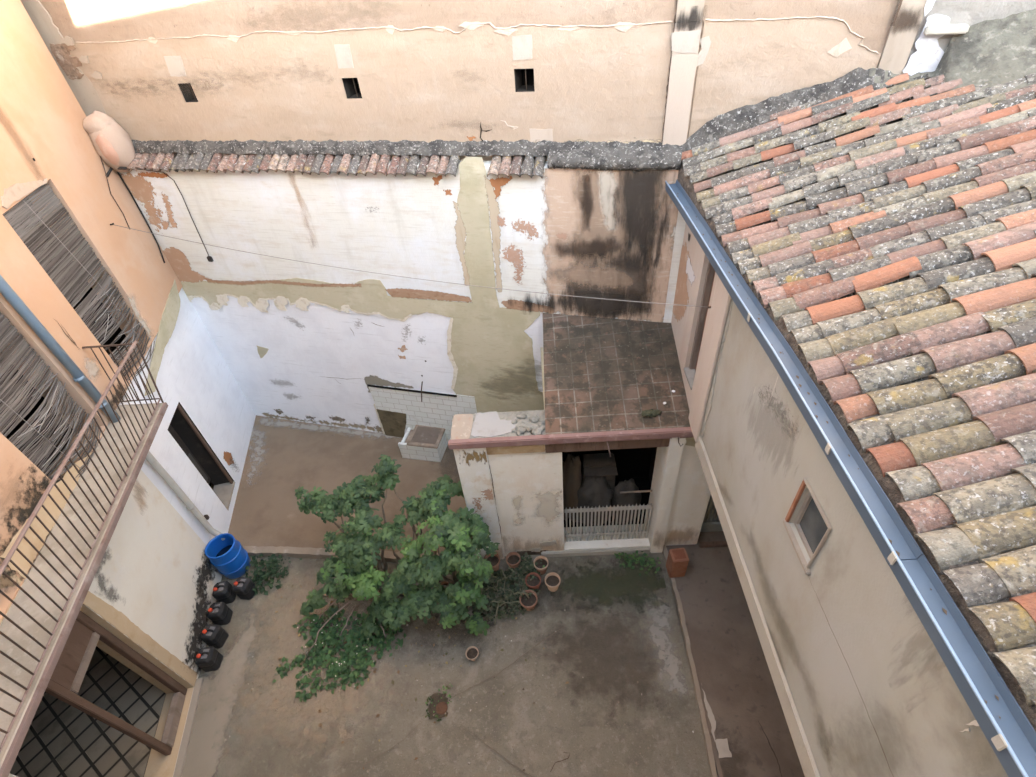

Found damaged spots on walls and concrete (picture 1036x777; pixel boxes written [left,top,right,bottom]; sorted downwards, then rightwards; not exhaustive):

damp [677,6,701,31]
damp [893,0,935,32]
flaking render [50,21,673,80]
flaking render [0,178,48,209]
peeling [121,172,177,232]
peeling [484,175,555,313]
damp [525,168,679,322]
flaking render [262,409,383,433]
damp [0,467,63,588]
peeling [472,489,493,513]